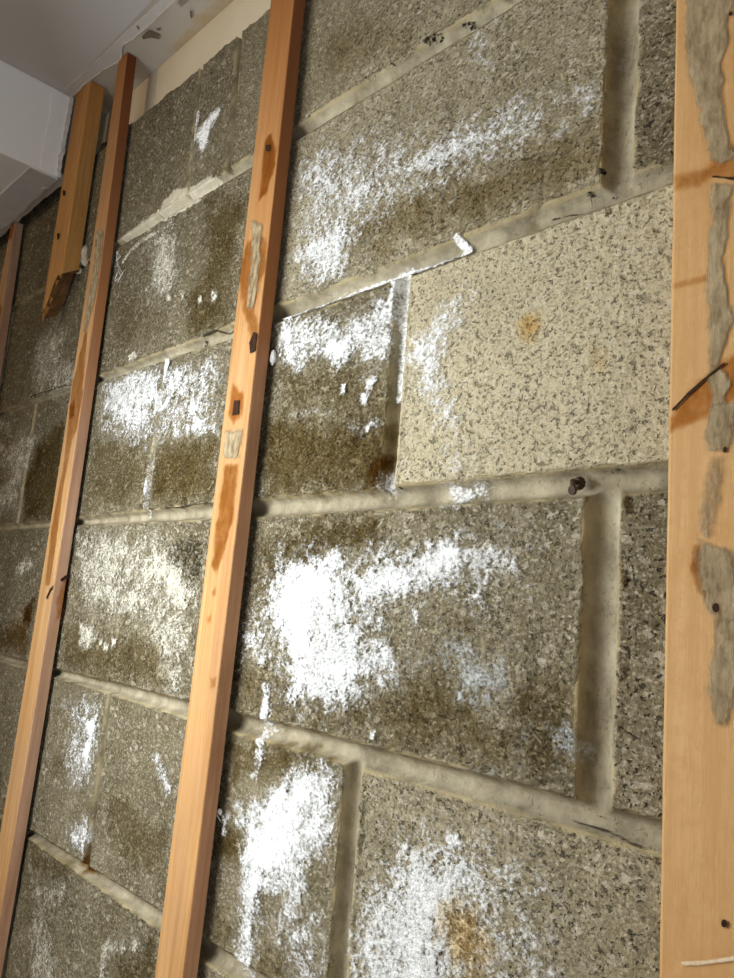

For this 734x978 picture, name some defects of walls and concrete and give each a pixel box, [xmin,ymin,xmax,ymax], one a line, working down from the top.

leakage [295,106,542,282]
leakage [122,222,183,301]
leakage [98,358,216,436]
crack [672,363,725,410]
leakage [144,459,166,518]
leakage [246,533,515,712]
leakage [251,682,277,777]
leakage [222,759,337,978]